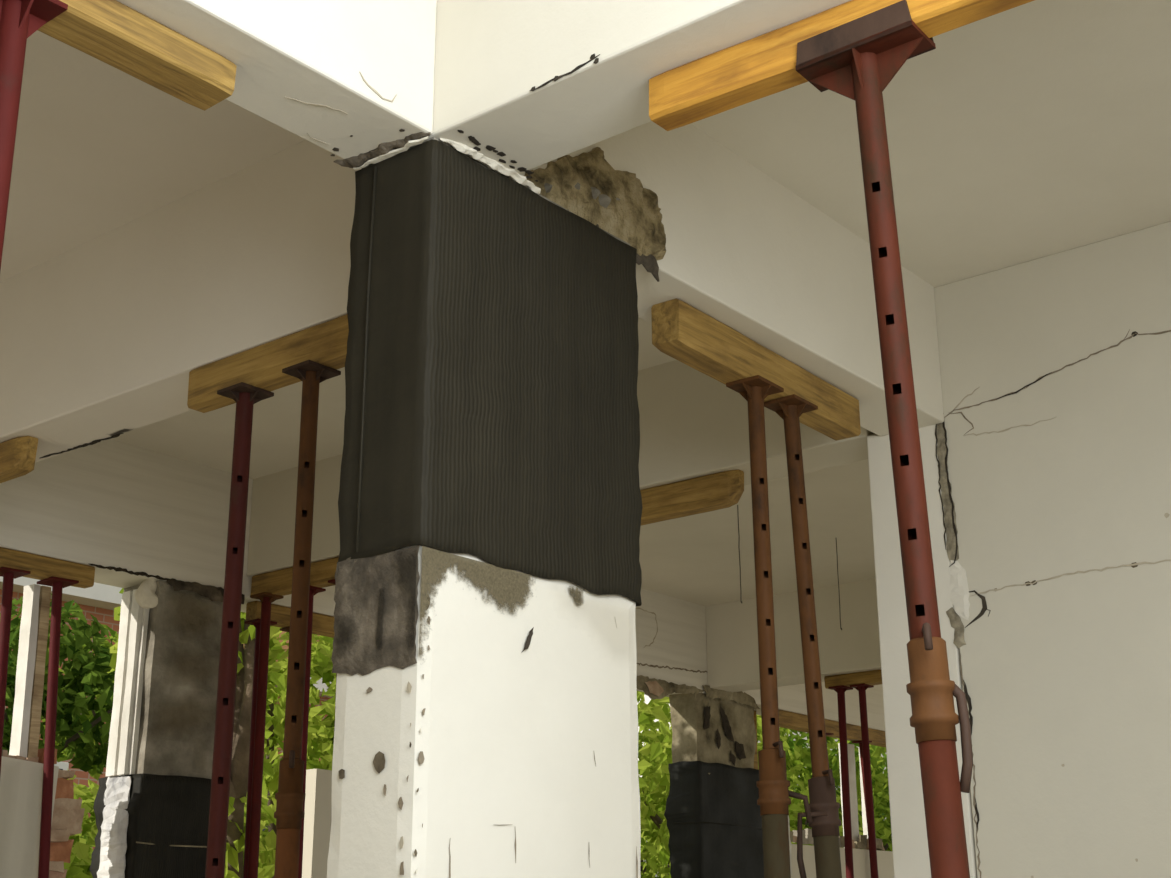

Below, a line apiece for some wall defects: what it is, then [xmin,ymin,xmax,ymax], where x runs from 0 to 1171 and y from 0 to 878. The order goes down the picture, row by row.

crack [530,53,600,91]
spalling [330,129,666,282]
crack [41,429,130,458]
crack [935,329,1171,620]
peeling [331,545,431,694]
flaking render [373,751,403,810]
flaking render [636,675,760,766]
crack [959,651,981,878]
flaking render [400,836,417,875]